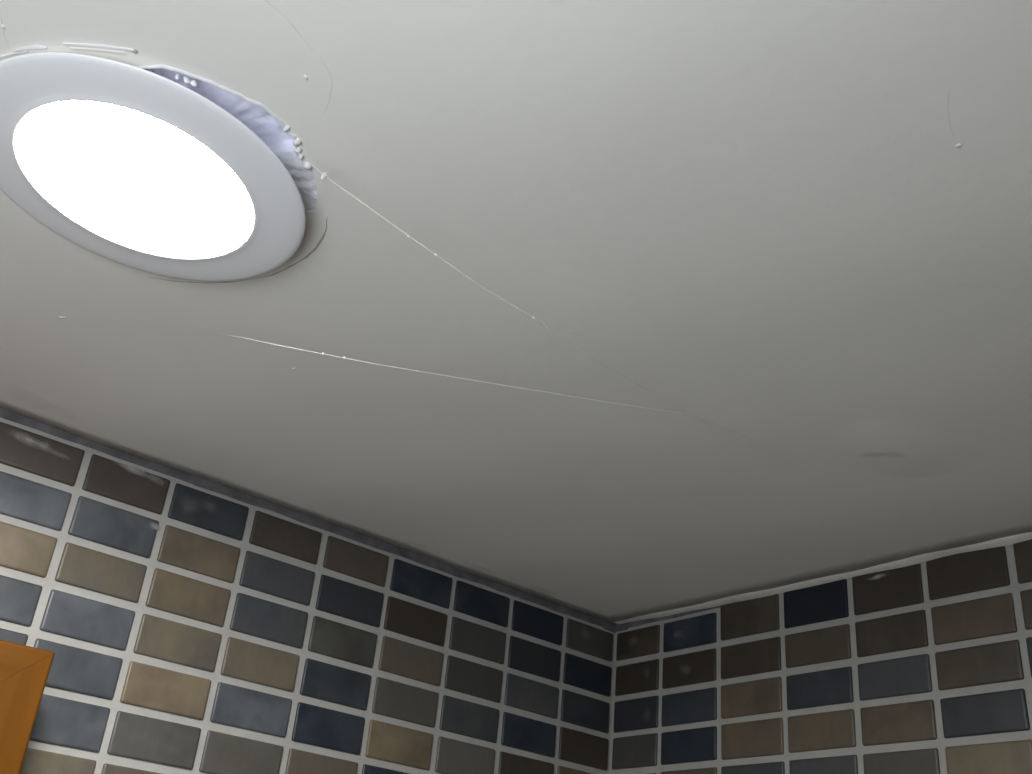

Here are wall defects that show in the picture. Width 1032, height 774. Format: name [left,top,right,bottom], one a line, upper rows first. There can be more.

crack [148,220,327,284]